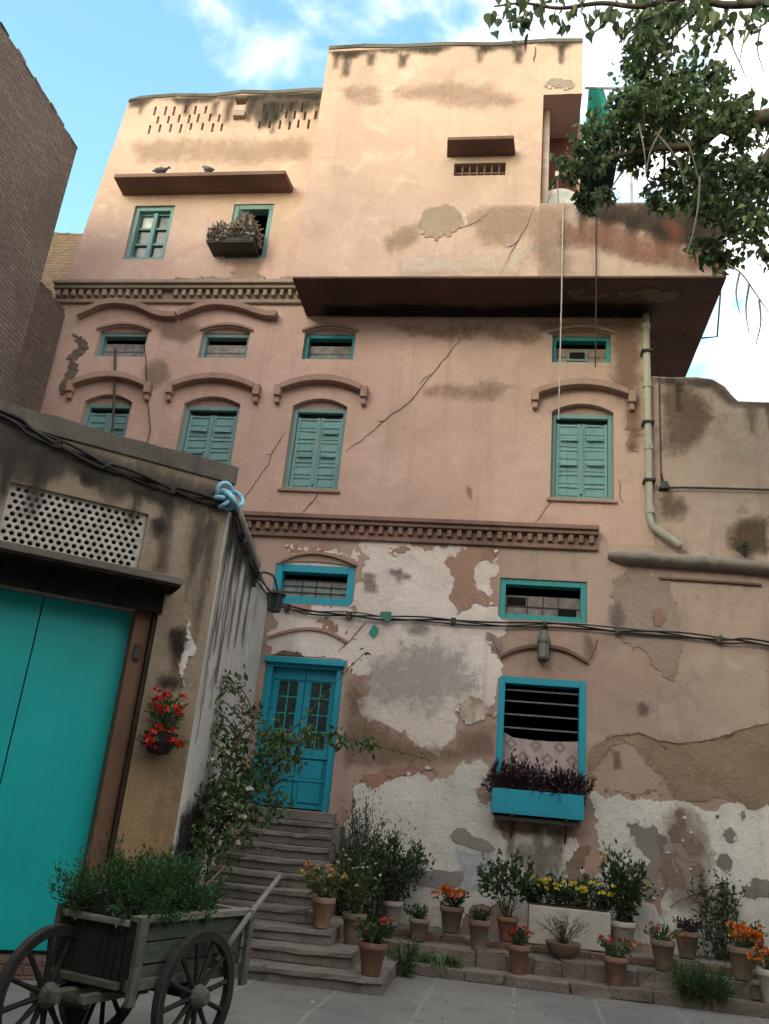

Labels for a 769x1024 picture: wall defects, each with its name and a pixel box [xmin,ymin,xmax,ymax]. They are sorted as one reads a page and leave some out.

damp [332,46,448,75]
damp [170,92,322,126]
spalling [418,204,465,242]
crack [500,208,534,274]
damp [400,202,723,274]
crack [349,334,463,449]
damp [656,377,769,448]
damp [0,425,260,691]
peeling [444,546,498,614]
spalling [178,619,196,687]
peeling [609,567,683,682]
peeling [587,722,769,906]